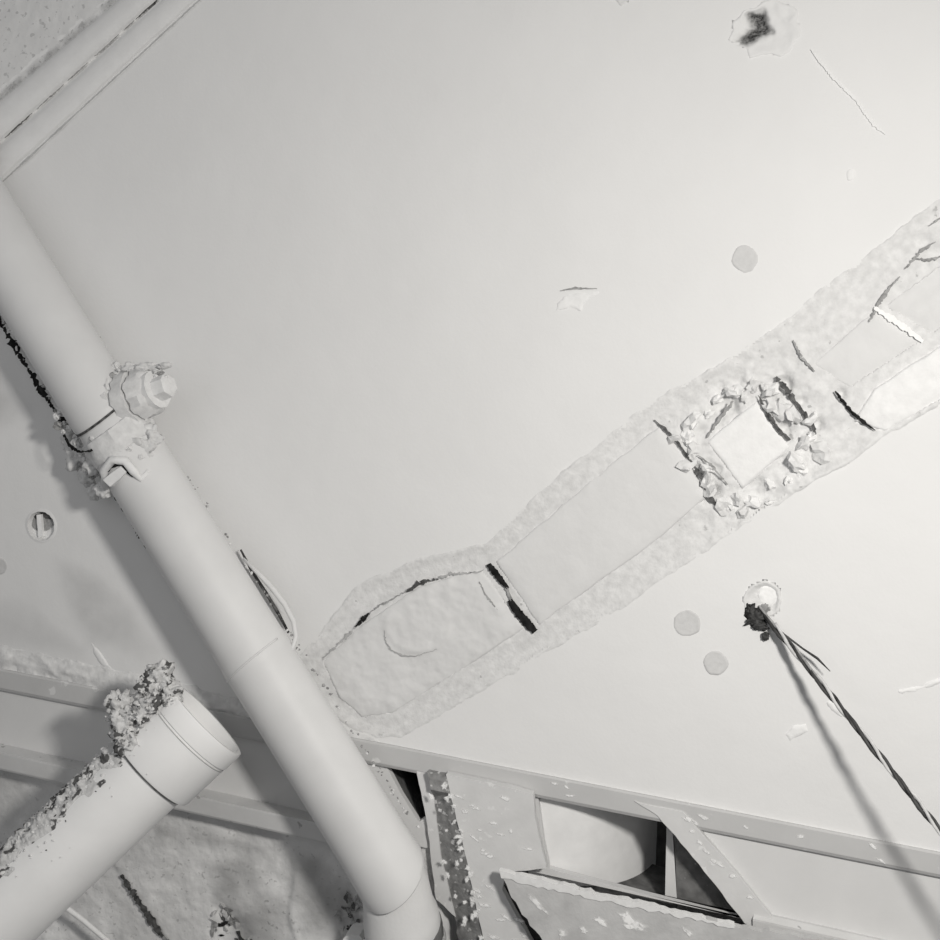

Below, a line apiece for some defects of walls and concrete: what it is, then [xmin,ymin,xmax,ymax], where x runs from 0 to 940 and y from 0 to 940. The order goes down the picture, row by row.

spalling [728,0,801,58]
crack [868,218,940,322]
crack [0,316,69,425]
crack [793,340,815,372]
crack [758,376,816,441]
crack [835,391,875,430]
spalling [299,199,940,742]
crack [654,401,734,505]
crack [322,563,538,660]
spalling [0,643,141,694]
spalling [180,684,249,717]